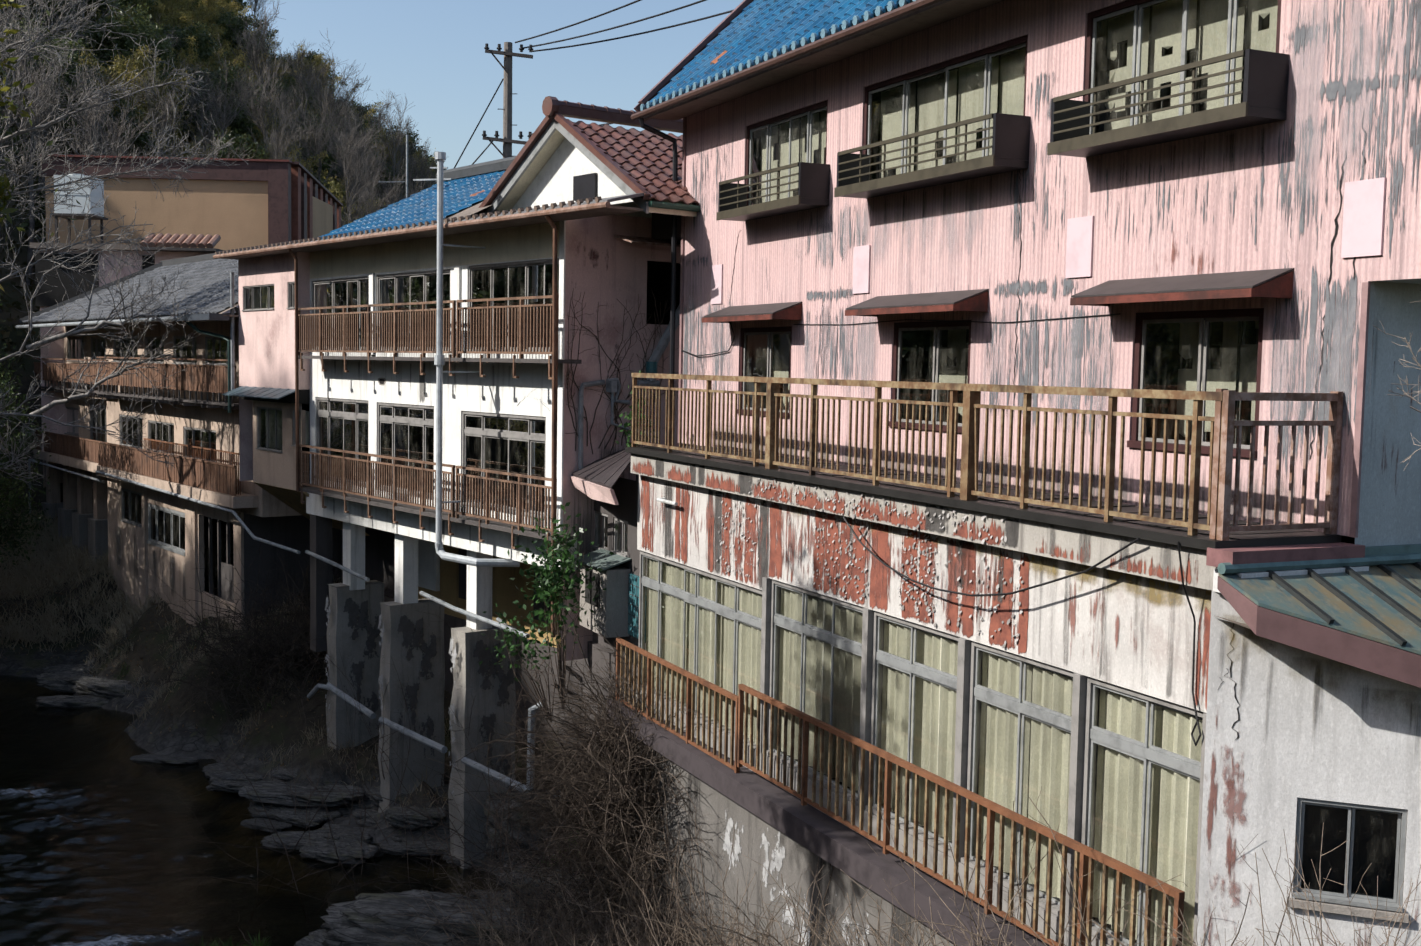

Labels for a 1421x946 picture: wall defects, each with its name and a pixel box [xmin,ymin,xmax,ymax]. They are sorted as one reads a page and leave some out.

crack [1309,111,1367,460]
peeling [633,456,1090,654]
peeling [1110,555,1198,584]
damp [343,598,380,731]
damp [397,615,437,758]
damp [473,640,514,791]
crack [1218,623,1240,740]
damp [721,810,743,874]
damp [760,827,869,946]
damp [891,904,913,946]
rust [1207,749,1251,906]